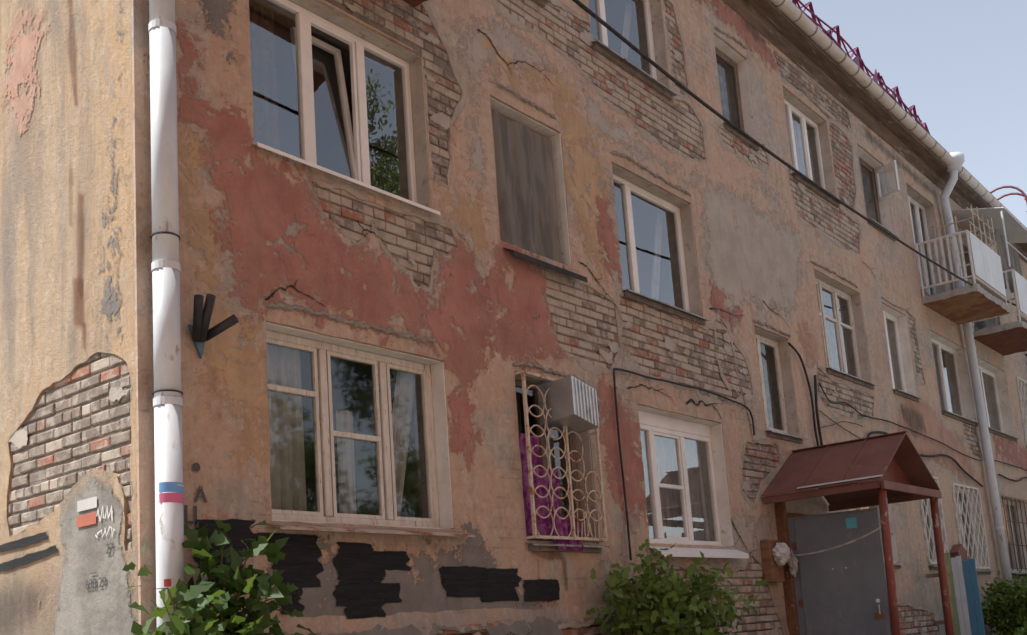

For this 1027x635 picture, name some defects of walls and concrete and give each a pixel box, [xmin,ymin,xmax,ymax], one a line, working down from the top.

flaking render [98,110,127,340]
peeling [140,222,153,314]
crack [265,280,325,307]
peeling [175,0,791,558]
spalling [816,363,875,424]
spalling [7,351,137,550]
flaking render [279,536,347,635]
flaking render [310,522,613,635]
spalling [898,601,940,635]